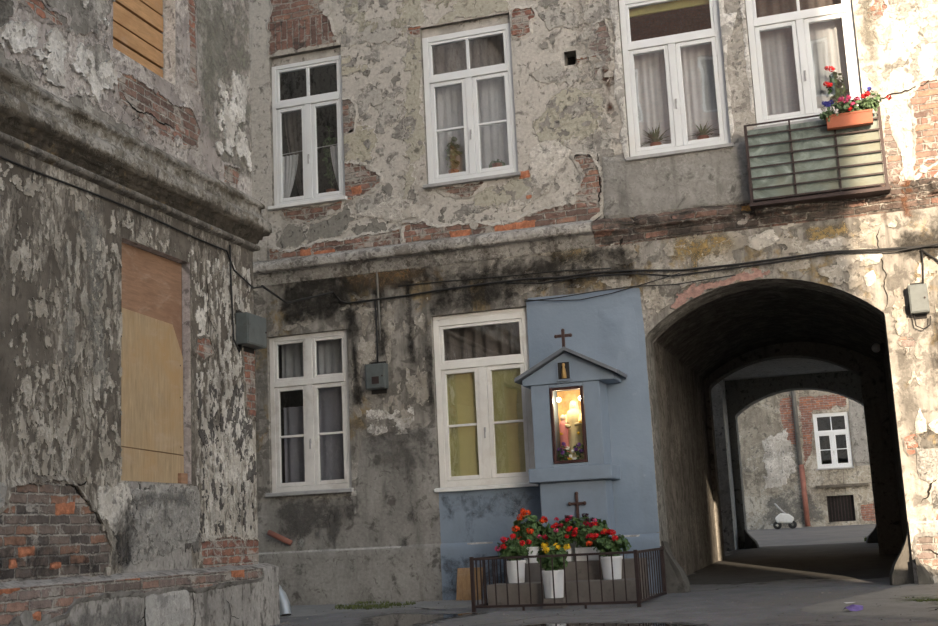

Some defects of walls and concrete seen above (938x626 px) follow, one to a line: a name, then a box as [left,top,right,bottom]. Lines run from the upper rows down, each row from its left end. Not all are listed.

flaking render [0,0,252,188]
flaking render [265,0,621,260]
flaking render [858,0,938,185]
flaking render [0,162,264,626]
water stain [355,268,419,363]
water stain [809,225,846,240]
peeling [892,256,938,359]
flaking render [911,531,938,576]